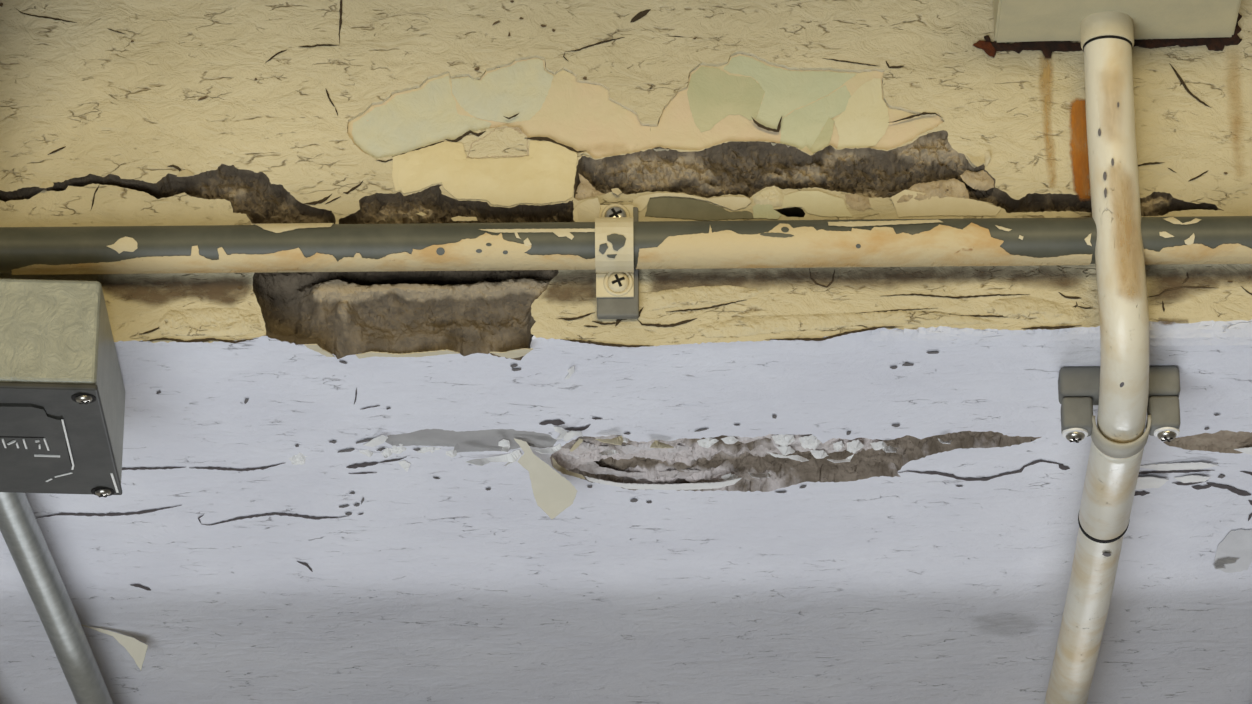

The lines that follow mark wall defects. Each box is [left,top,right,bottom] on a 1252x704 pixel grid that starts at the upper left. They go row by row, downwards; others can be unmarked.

crack [266,0,342,62]
rust [1133,13,1242,51]
spalling [0,54,1114,224]
rust [973,35,1082,182]
rust [1070,100,1090,199]
spalling [1140,192,1224,217]
spalling [237,270,559,371]
crack [122,463,284,471]
spalling [330,424,1041,519]
crack [898,459,1070,481]
spalling [1136,414,1252,490]
crack [38,505,346,525]